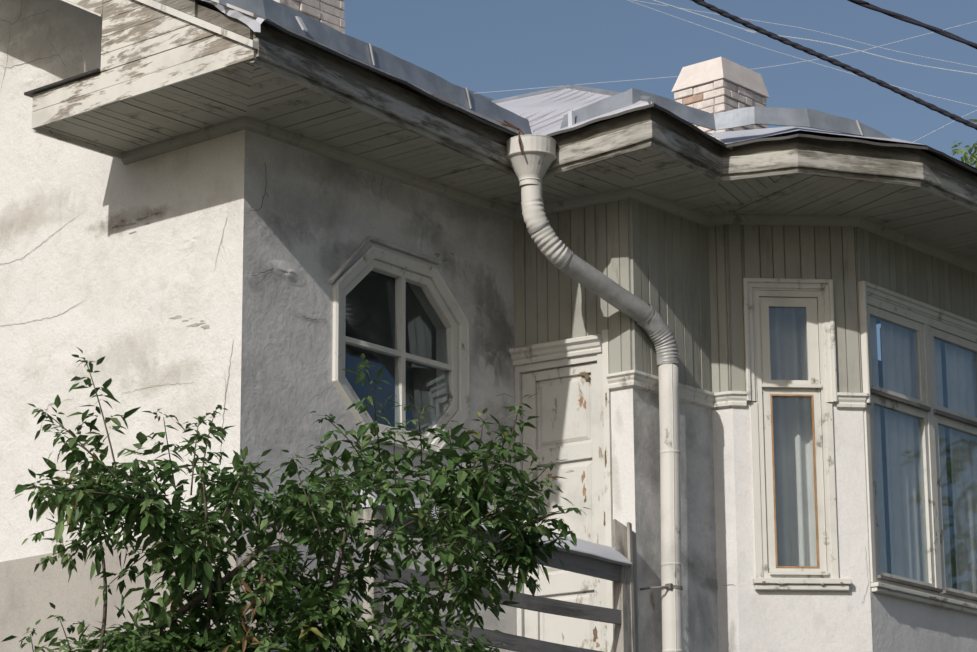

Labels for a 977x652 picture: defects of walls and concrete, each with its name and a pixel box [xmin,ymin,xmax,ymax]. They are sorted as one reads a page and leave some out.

crack [0,2,66,91]
spalling [112,212,163,234]